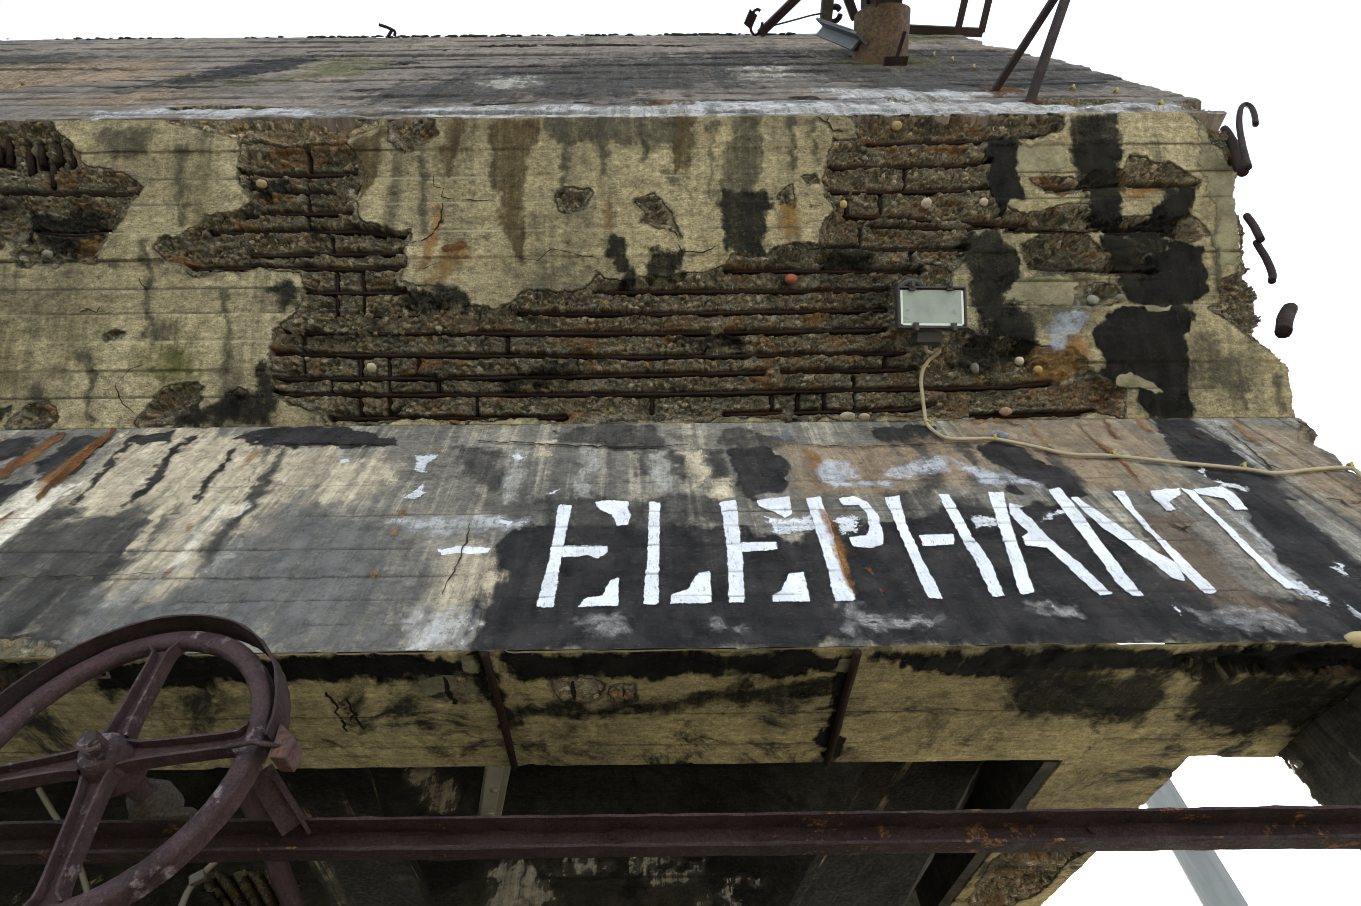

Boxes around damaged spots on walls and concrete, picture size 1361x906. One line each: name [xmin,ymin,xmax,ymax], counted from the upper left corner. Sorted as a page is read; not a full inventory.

spalling [0,122,143,269]
spalling [155,95,1199,427]
damp [367,34,1184,264]
spalling [1178,99,1259,179]
spalling [1208,210,1298,352]
rust [0,432,66,478]
rust [35,428,116,500]
spalling [134,383,204,428]
damp [0,354,504,696]
damp [456,234,1361,555]
damp [1140,511,1291,619]
damp [499,642,1361,738]